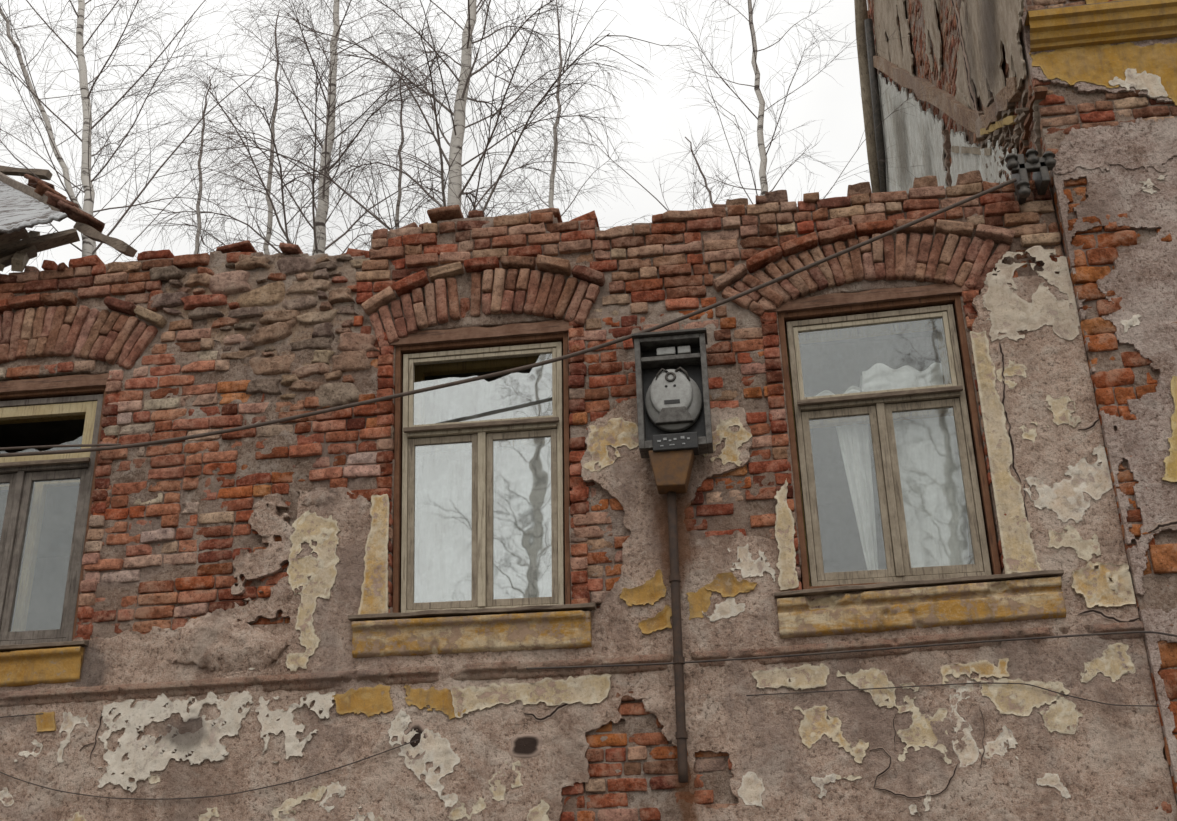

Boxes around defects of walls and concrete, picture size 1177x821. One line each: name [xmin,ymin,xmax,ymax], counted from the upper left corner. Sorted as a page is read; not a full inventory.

spalling [982,68,1177,609]
peeling [583,417,639,472]
peeling [703,417,752,467]
spalling [79,576,245,634]
peeling [286,510,340,672]
peeling [619,569,672,635]
peeling [686,544,776,622]
peeling [1080,643,1136,683]
flaking render [14,674,765,821]
peeling [793,705,869,799]
peeling [752,658,1083,767]
spalling [1144,640,1177,794]